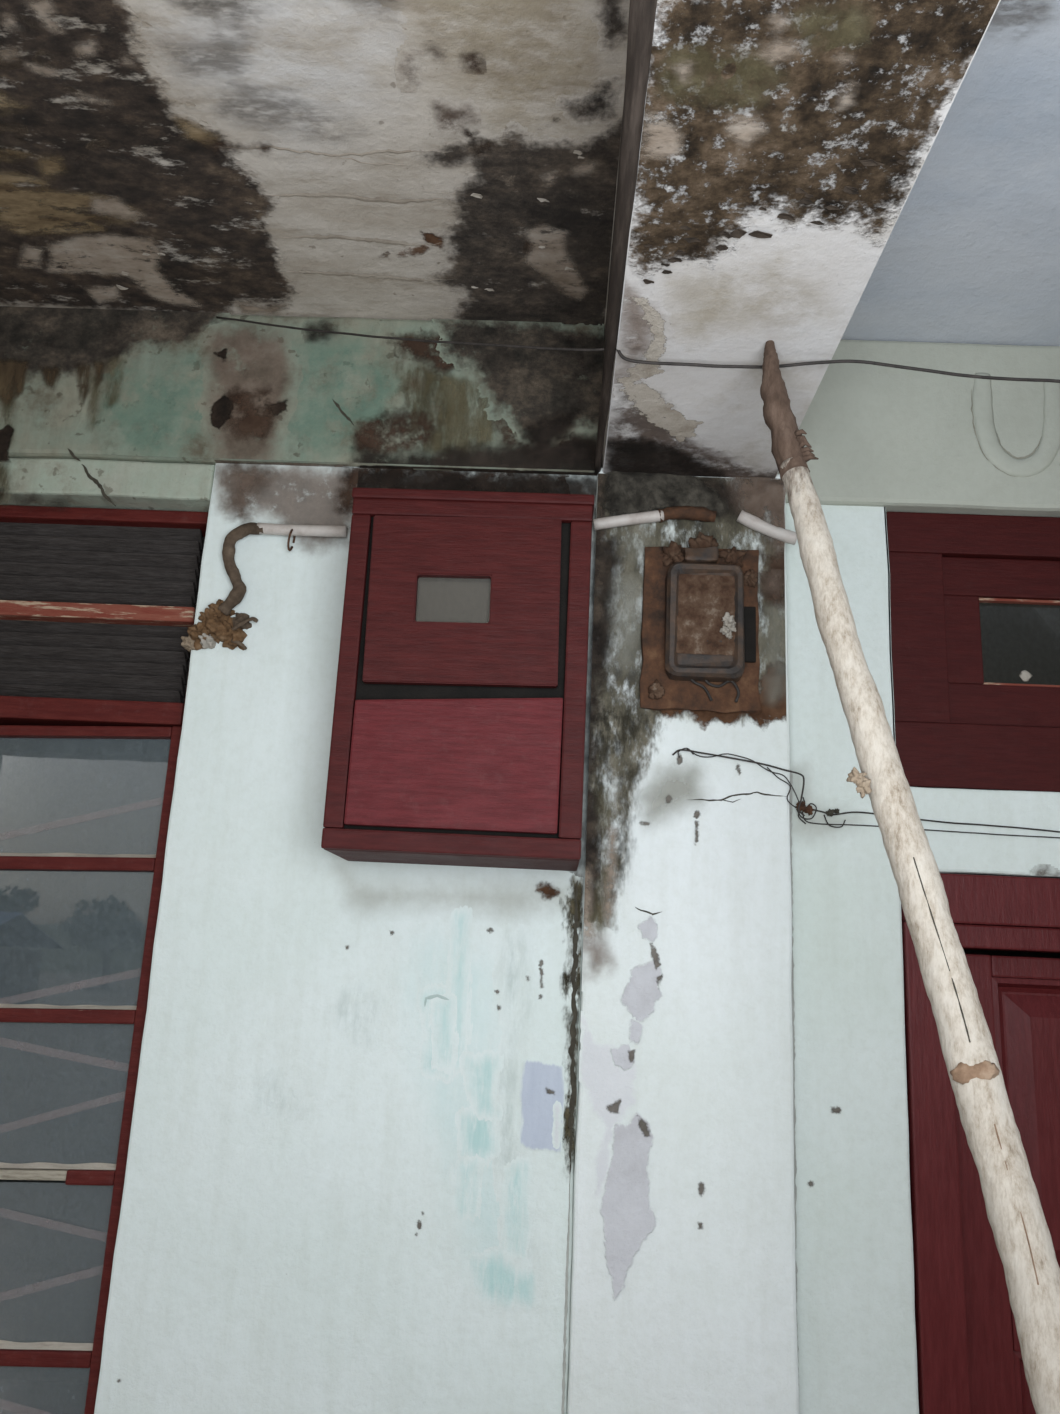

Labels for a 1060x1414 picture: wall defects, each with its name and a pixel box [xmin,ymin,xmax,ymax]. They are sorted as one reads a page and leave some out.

spalling [0,425,14,462]
crack [68,449,116,506]
damp [0,0,630,560]
damp [443,471,786,992]
corrosion [648,660,787,730]
corrosion [661,531,785,656]
damp [628,0,1060,348]
peeling [519,914,664,1301]